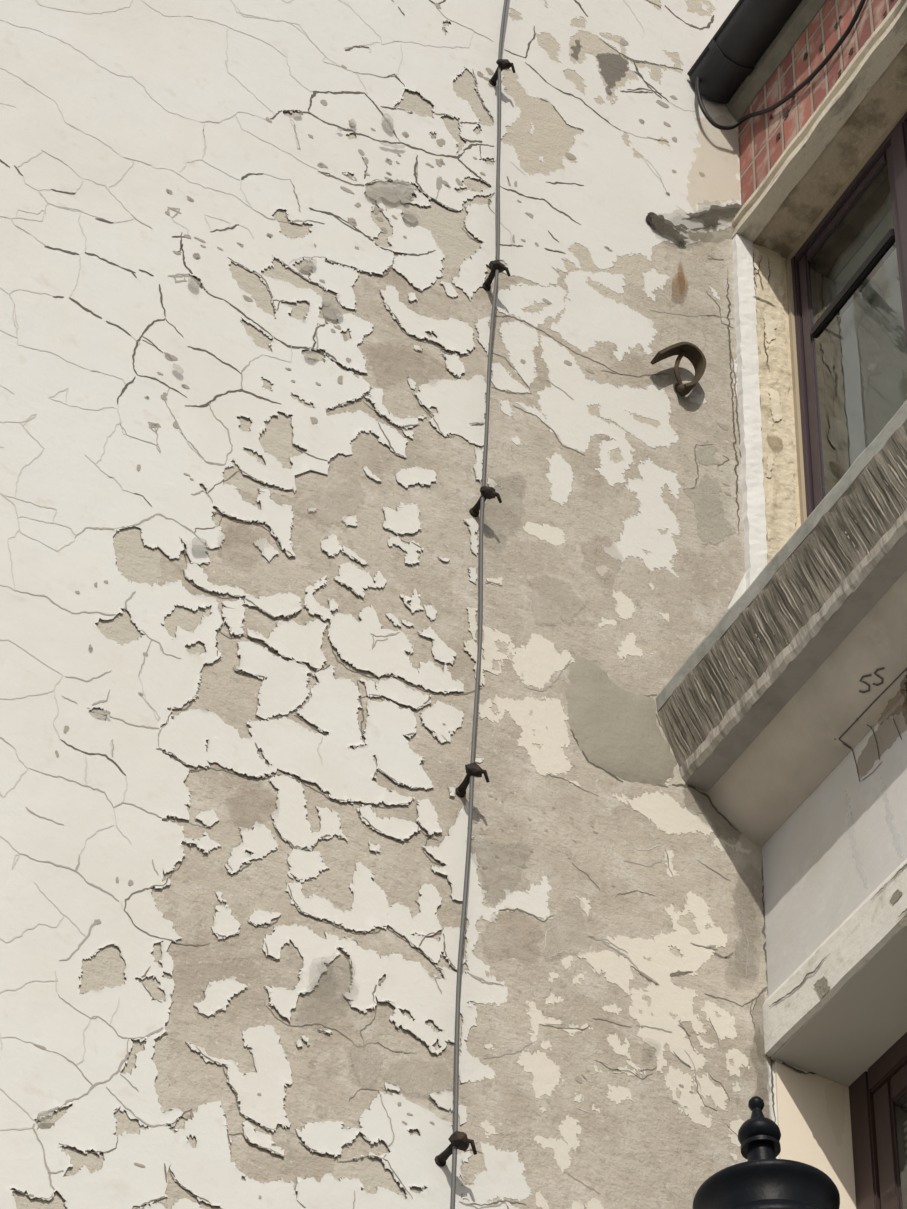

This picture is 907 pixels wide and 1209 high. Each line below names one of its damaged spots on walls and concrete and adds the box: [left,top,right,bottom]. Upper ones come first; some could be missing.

crack [624,0,714,31]
peeling [535,16,683,105]
peeling [395,68,584,187]
crack [653,218,775,535]
peeling [96,610,148,656]
crack [0,0,673,1209]
peeling [113,149,907,1209]
crack [656,784,738,831]
peeling [78,945,126,994]
crack [487,858,830,1136]
peeling [12,1191,66,1209]
peeling [61,1147,104,1177]